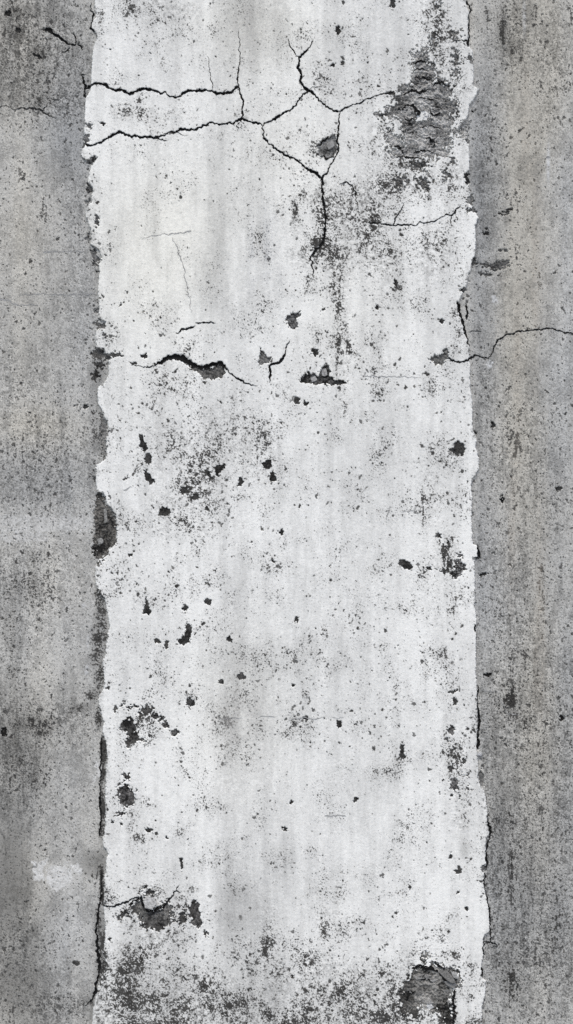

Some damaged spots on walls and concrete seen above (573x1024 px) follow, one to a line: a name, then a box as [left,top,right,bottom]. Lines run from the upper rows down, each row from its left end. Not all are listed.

spalling [373,37,470,162]
crack [86,32,461,278]
crack [130,231,290,386]
crack [447,327,573,363]
spalling [91,493,118,566]
spalling [117,897,209,938]
spalling [400,950,464,1024]